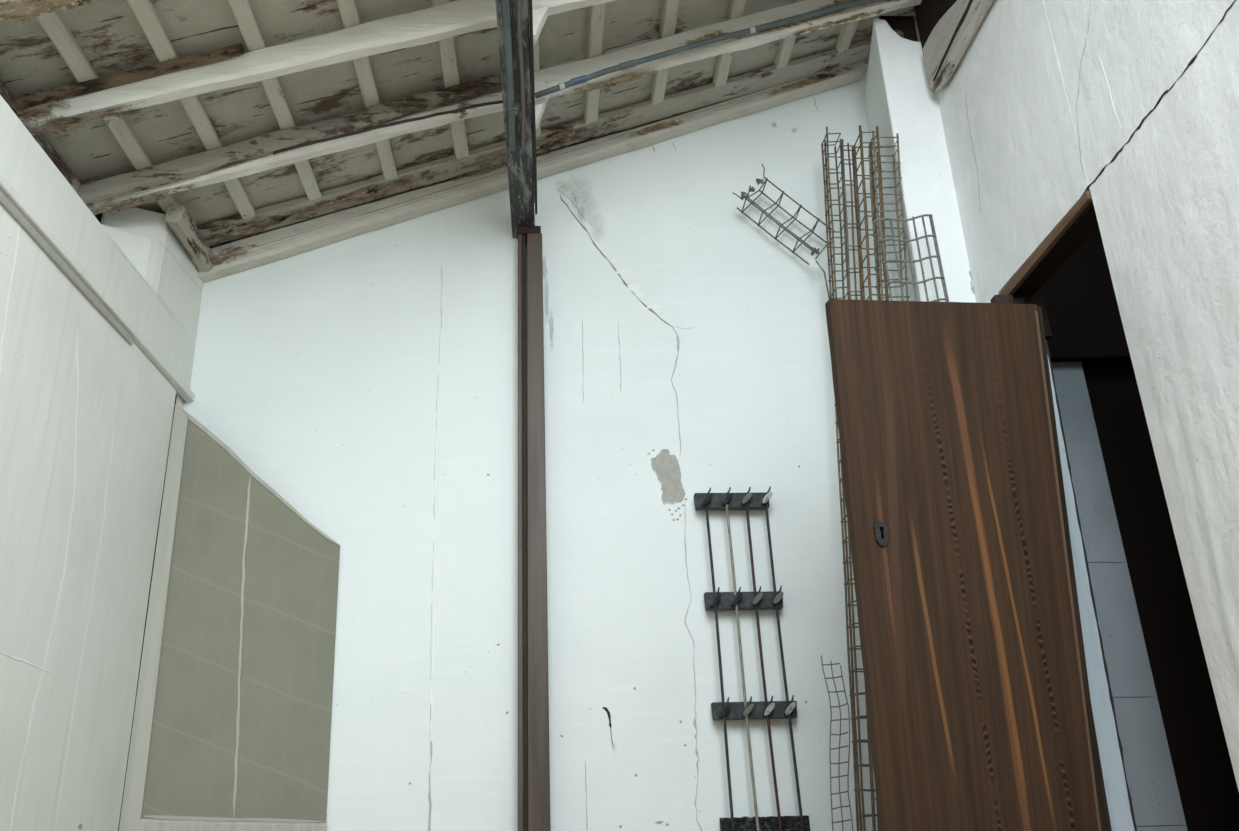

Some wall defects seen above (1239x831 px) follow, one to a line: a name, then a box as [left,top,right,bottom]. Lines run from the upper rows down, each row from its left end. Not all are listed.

peeling [0,0,100,23]
peeling [14,87,146,137]
peeling [536,118,682,157]
crack [1077,0,1235,197]
peeling [86,185,194,215]
peeling [204,150,507,265]
crack [559,190,696,455]
flaking render [647,449,687,521]
crack [684,518,702,831]
crack [582,763,590,830]